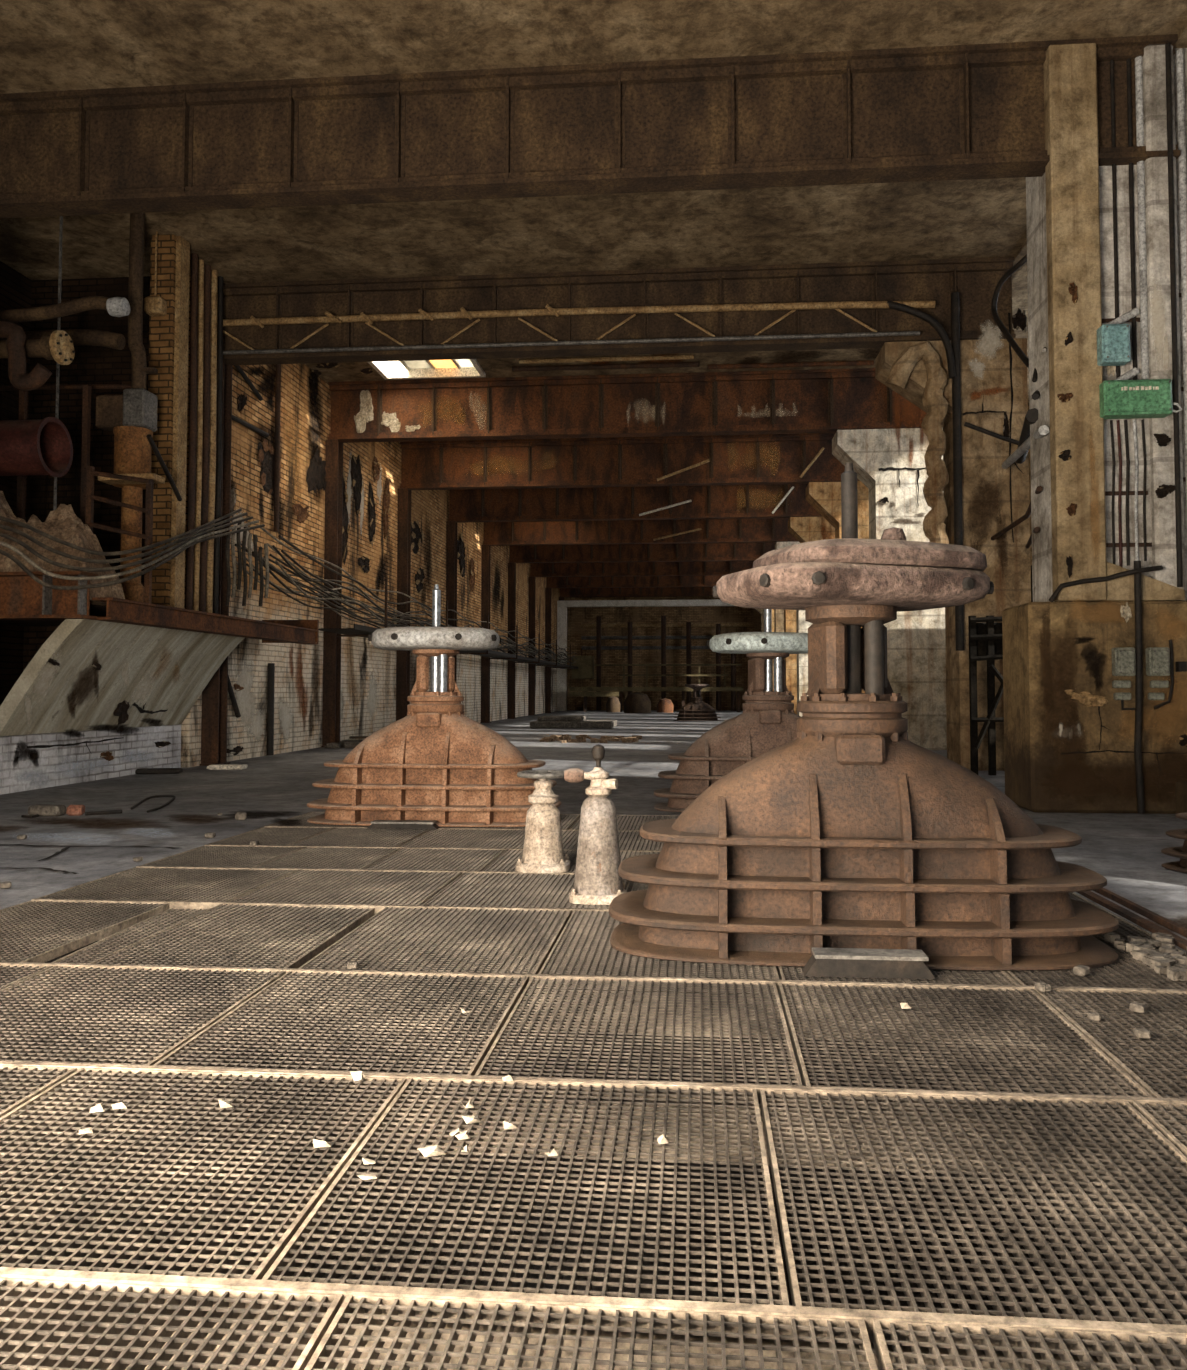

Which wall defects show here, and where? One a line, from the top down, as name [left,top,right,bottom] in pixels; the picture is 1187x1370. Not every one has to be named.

spalling [1068,282,1078,304]
peeling [354,368,421,433]
spalling [1057,393,1073,403]
spalling [1003,412,1011,438]
spalling [1058,449,1072,461]
spalling [292,448,326,523]
spalling [113,700,130,725]